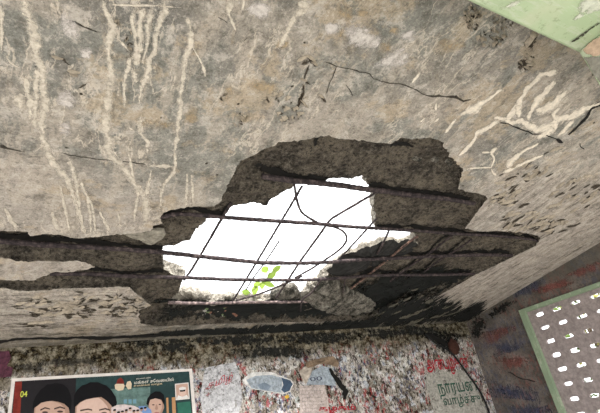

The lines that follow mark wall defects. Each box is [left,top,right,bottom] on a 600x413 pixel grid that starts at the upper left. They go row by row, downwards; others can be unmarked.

damp [14,0,109,233]
damp [99,2,206,221]
crack [326,62,471,102]
damp [445,88,502,133]
damp [457,70,600,176]
crack [501,102,600,149]
spalling [0,135,600,327]
damp [114,263,517,359]
damp [19,358,105,372]